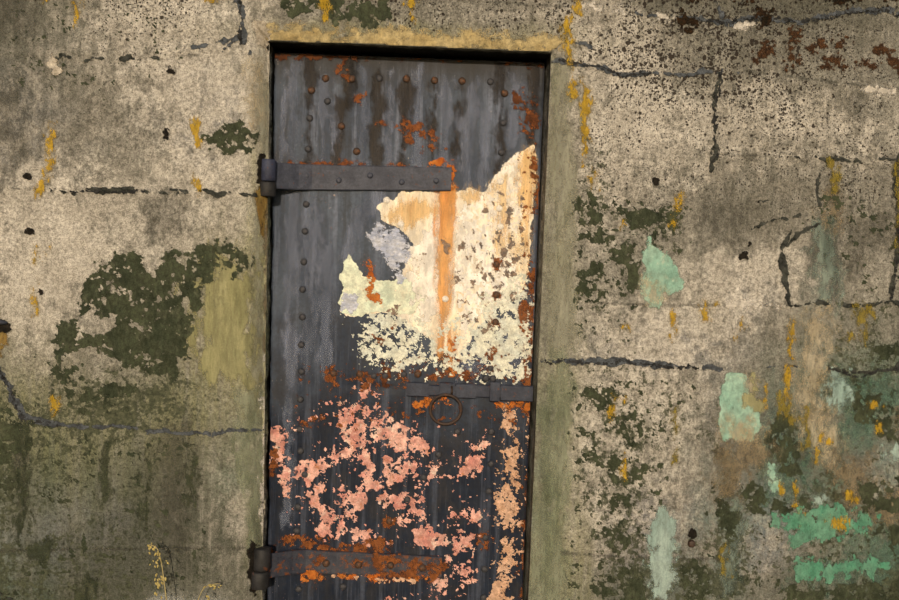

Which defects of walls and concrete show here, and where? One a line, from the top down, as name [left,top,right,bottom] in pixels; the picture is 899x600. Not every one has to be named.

crack [190,0,252,55]
rust [275,54,374,82]
crack [551,41,740,173]
rust [307,86,542,425]
peeling [338,145,537,385]
peeling [639,236,684,308]
crack [751,153,899,308]
crack [540,356,724,372]
peeling [718,372,762,442]
peeling [269,382,524,600]
rust [271,515,449,584]
peeling [770,501,891,585]